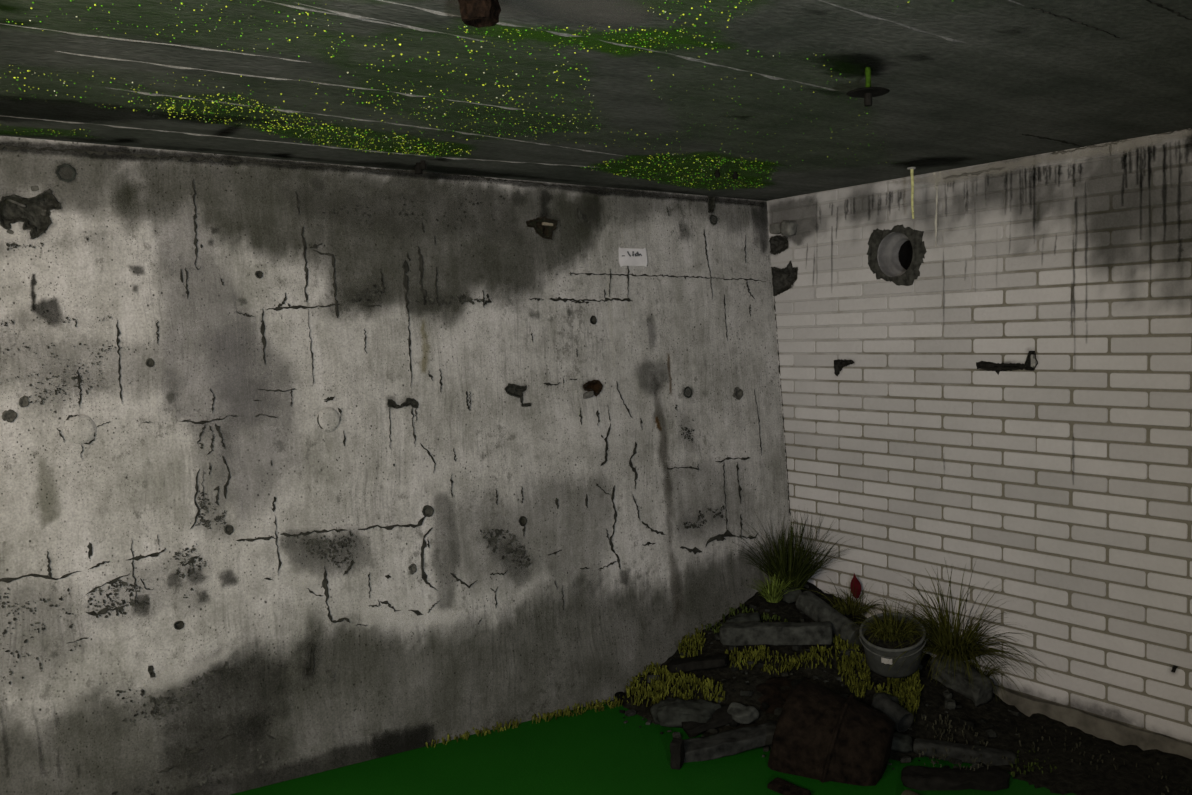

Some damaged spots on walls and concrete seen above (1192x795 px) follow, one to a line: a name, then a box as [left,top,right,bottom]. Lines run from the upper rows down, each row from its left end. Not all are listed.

damp [0,97,118,121]
spalling [0,186,61,251]
damp [0,139,814,325]
spalling [769,235,798,296]
damp [900,158,965,232]
damp [974,148,1192,269]
crack [0,179,508,643]
spalling [505,383,531,407]
spalling [583,380,603,399]
crack [530,231,791,610]
damp [0,551,802,795]